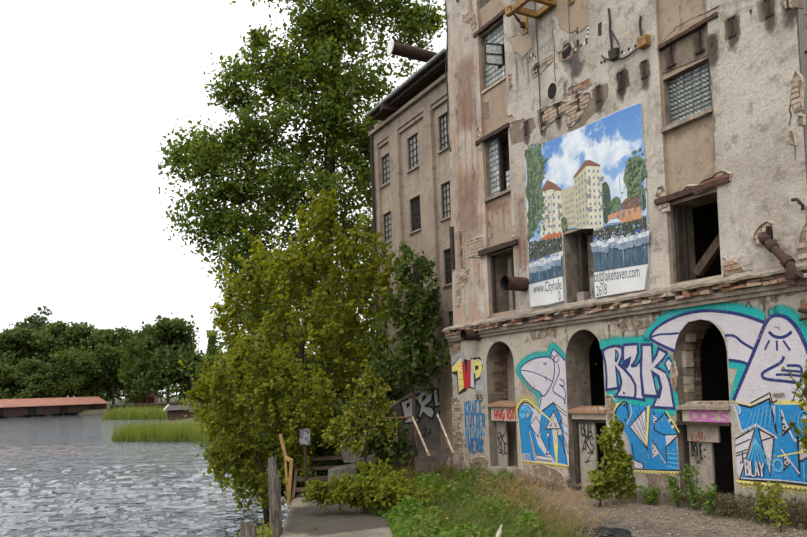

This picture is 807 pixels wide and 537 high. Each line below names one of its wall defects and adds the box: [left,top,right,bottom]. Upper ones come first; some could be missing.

peeling [531,0,602,79]
spalling [508,77,593,145]
spalling [788,71,806,146]
spalling [455,220,493,308]
spalling [795,206,807,263]
peeling [616,313,652,333]
spalling [452,395,489,475]